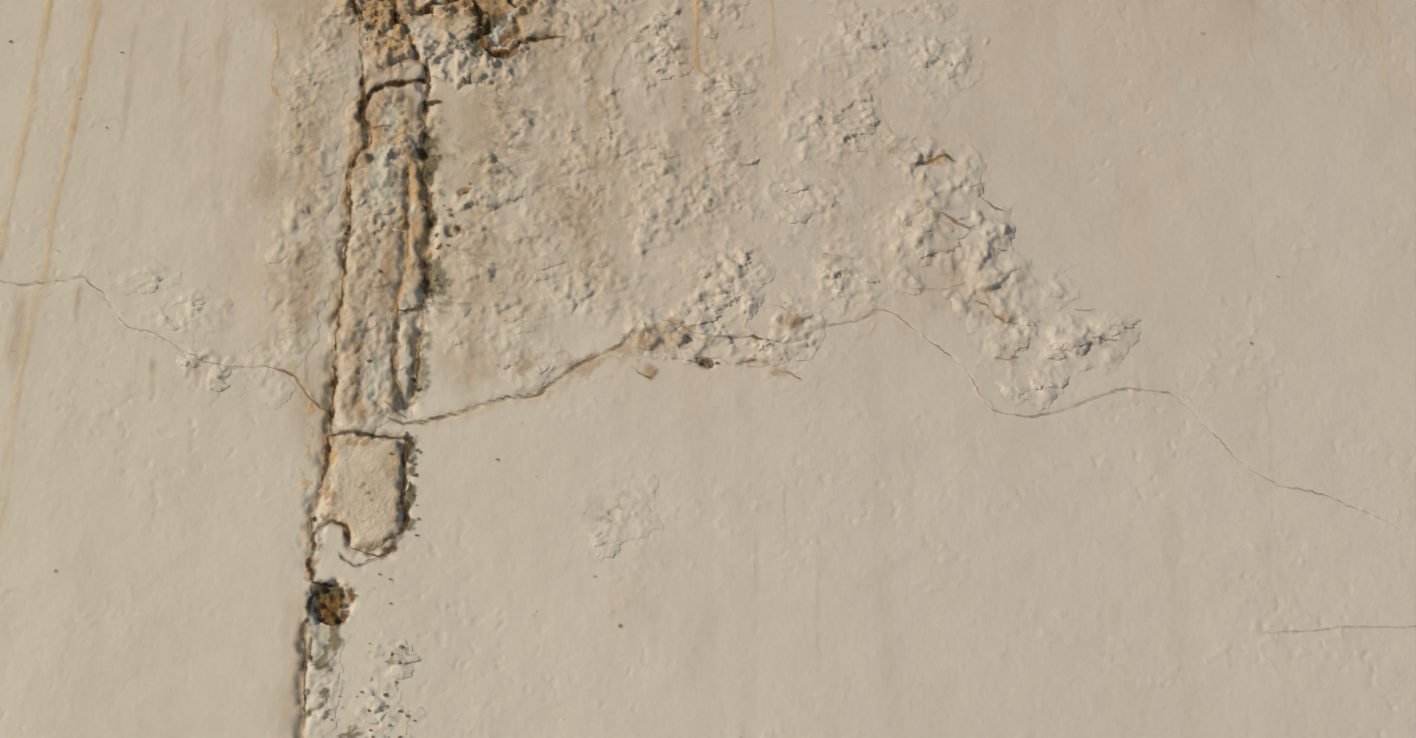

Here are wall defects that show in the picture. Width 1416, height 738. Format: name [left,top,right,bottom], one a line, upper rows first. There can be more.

spalling [326,0,559,94]
damp [367,104,399,210]
damp [414,134,471,311]
damp [410,333,428,404]
crack [33,0,1168,719]
damp [389,436,421,536]
spalling [302,581,426,738]